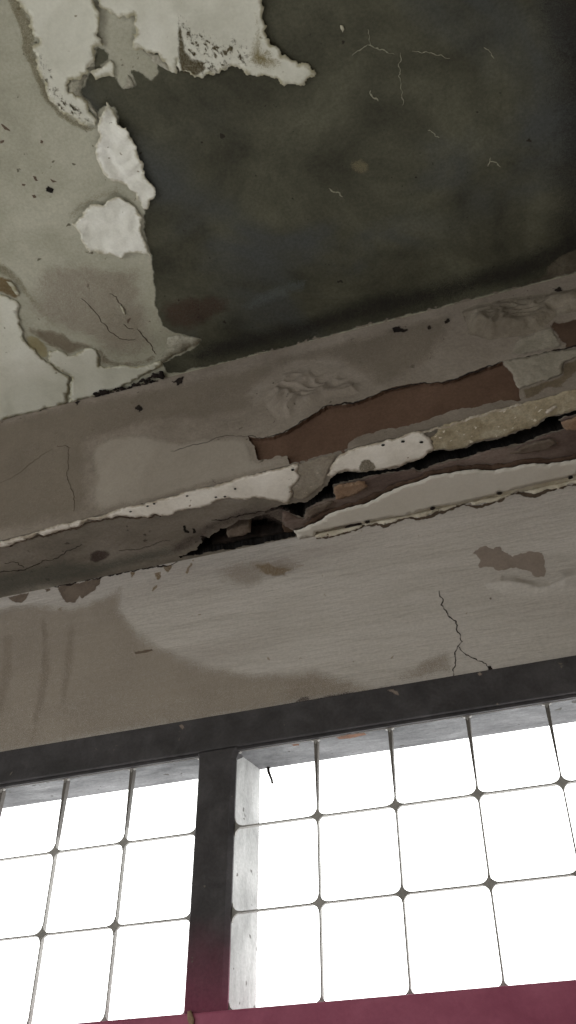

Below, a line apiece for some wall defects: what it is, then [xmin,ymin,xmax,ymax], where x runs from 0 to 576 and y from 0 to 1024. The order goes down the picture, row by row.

damp [177,16,248,76]
crack [354,30,450,104]
spalling [0,0,576,421]
crack [82,294,155,353]
spalling [0,319,576,548]
peeling [45,577,103,603]
peeling [473,546,546,577]
damp [0,546,377,752]
crack [439,594,490,676]